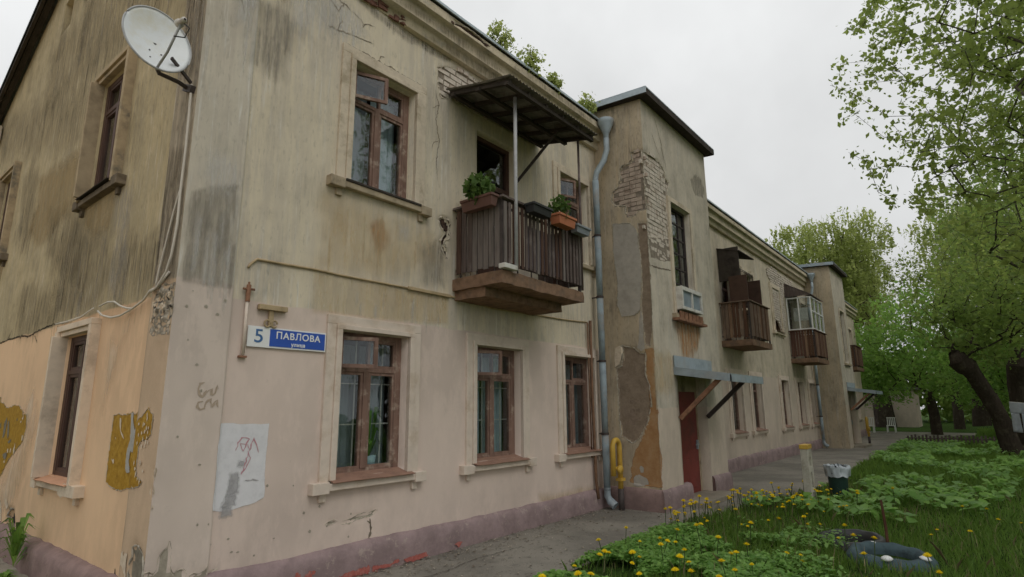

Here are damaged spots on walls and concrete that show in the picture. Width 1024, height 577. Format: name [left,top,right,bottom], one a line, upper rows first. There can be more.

flaking render [437,65,494,122]
crack [0,322,64,344]
flaking render [150,282,188,336]
flaking render [611,148,670,488]
peeling [0,397,27,476]
peeling [106,407,157,509]
flaking render [114,541,218,577]
peeling [339,552,428,577]